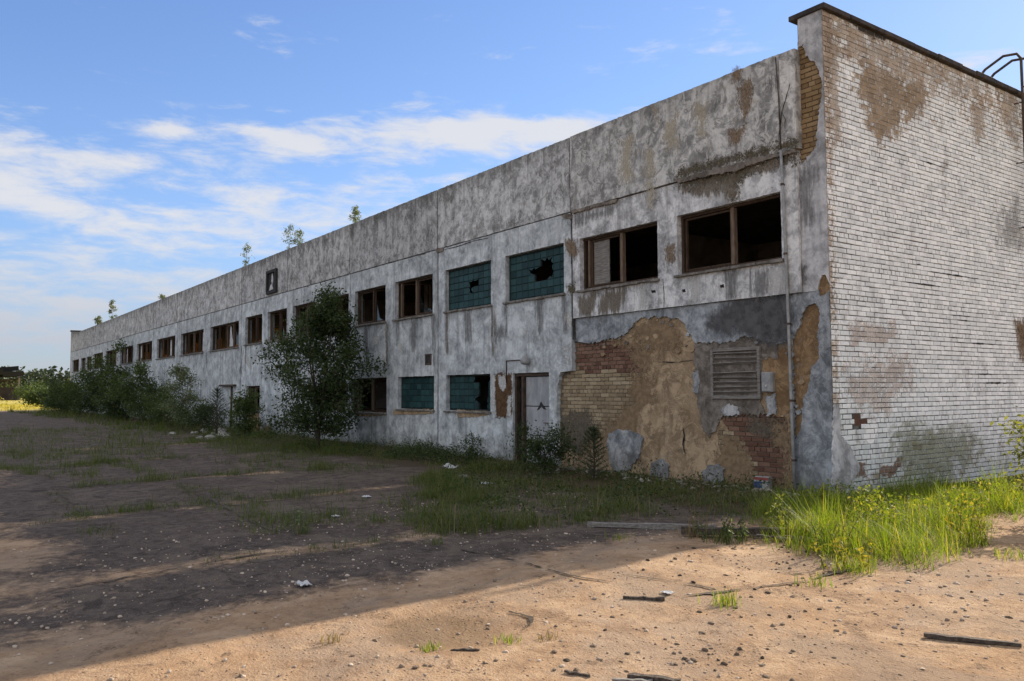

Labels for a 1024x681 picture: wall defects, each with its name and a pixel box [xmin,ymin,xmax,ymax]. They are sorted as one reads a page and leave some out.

water stain [618,102,708,208]
spalling [674,15,988,207]
spalling [560,275,832,490]
peeling [842,354,913,426]
water stain [892,421,983,477]